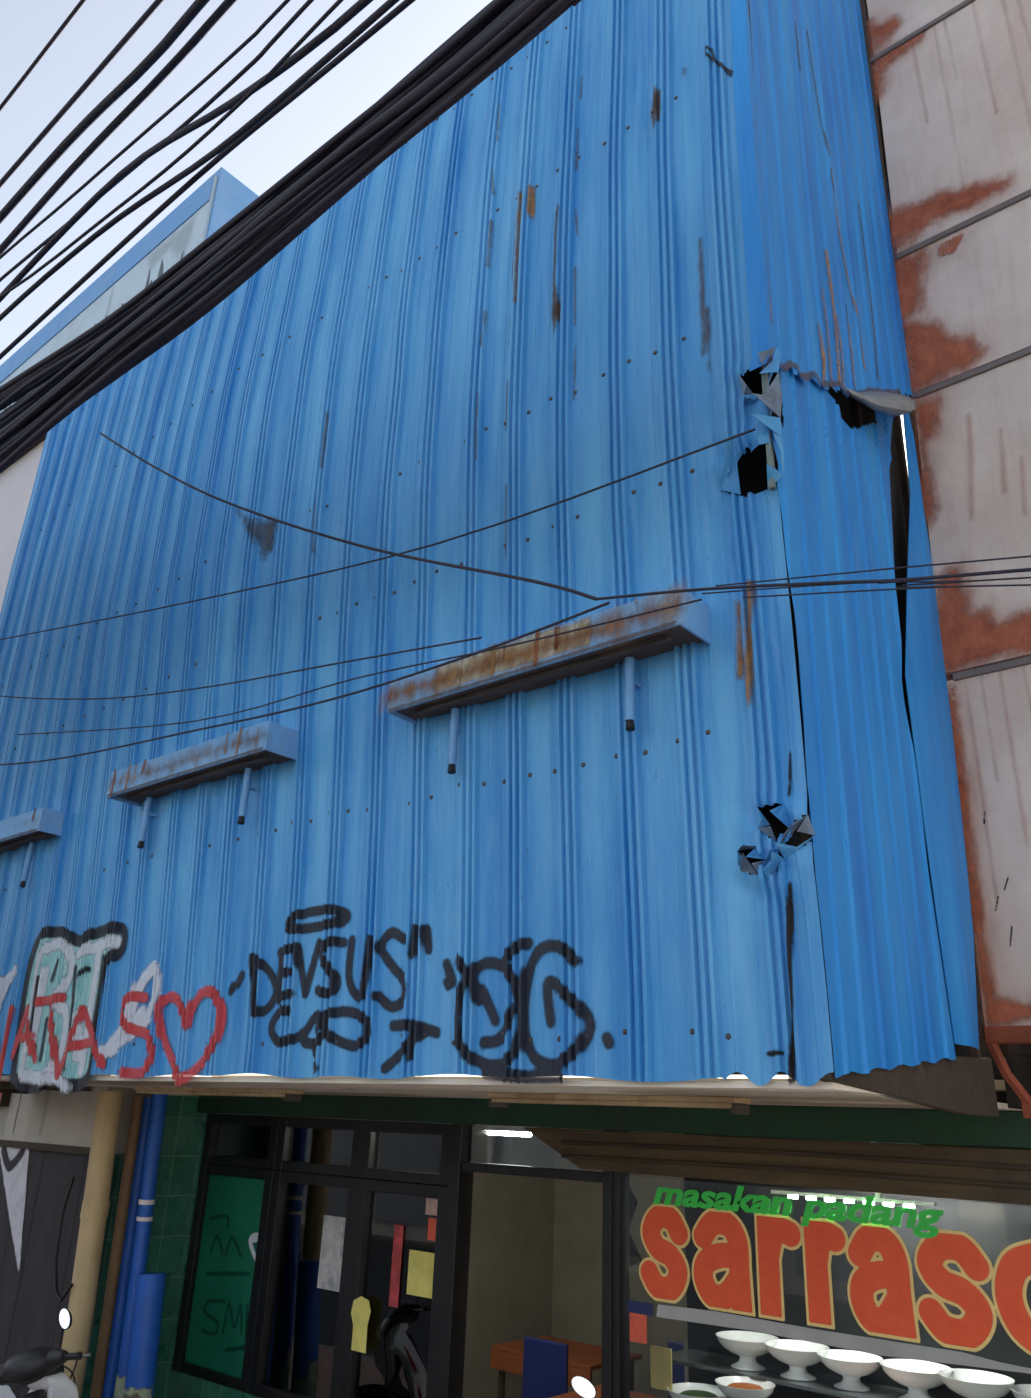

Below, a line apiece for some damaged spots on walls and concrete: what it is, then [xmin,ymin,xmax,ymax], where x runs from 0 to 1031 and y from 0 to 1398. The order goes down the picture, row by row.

corrosion [652,88,660,125]
corrosion [868,18,925,95]
corrosion [512,185,535,302]
corrosion [700,253,710,348]
corrosion [766,174,1007,522]
peeling [720,426,744,495]
peeling [739,348,784,490]
corrosion [387,593,681,711]
corrosion [737,581,754,701]
peeling [737,805,815,879]
corrosion [938,568,1031,1025]
peeling [114,1375,153,1398]